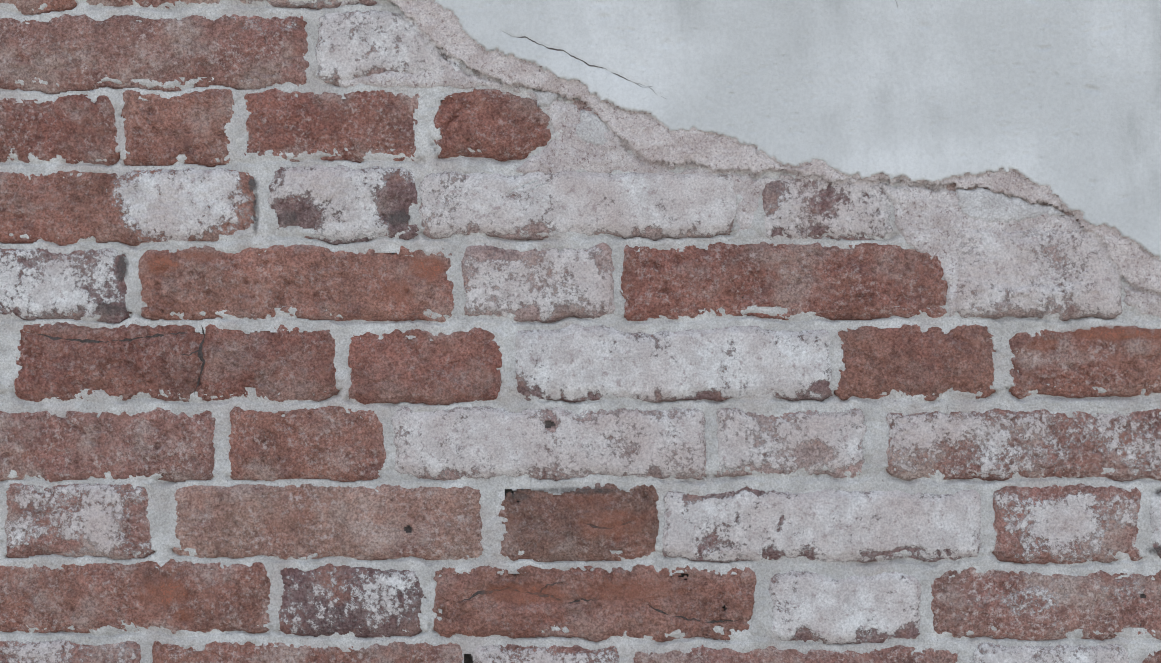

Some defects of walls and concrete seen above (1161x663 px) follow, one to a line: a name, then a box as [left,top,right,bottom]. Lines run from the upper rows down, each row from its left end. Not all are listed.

crack [518,36,666,99]
spalling [387,0,1161,294]
peeling [268,164,415,243]